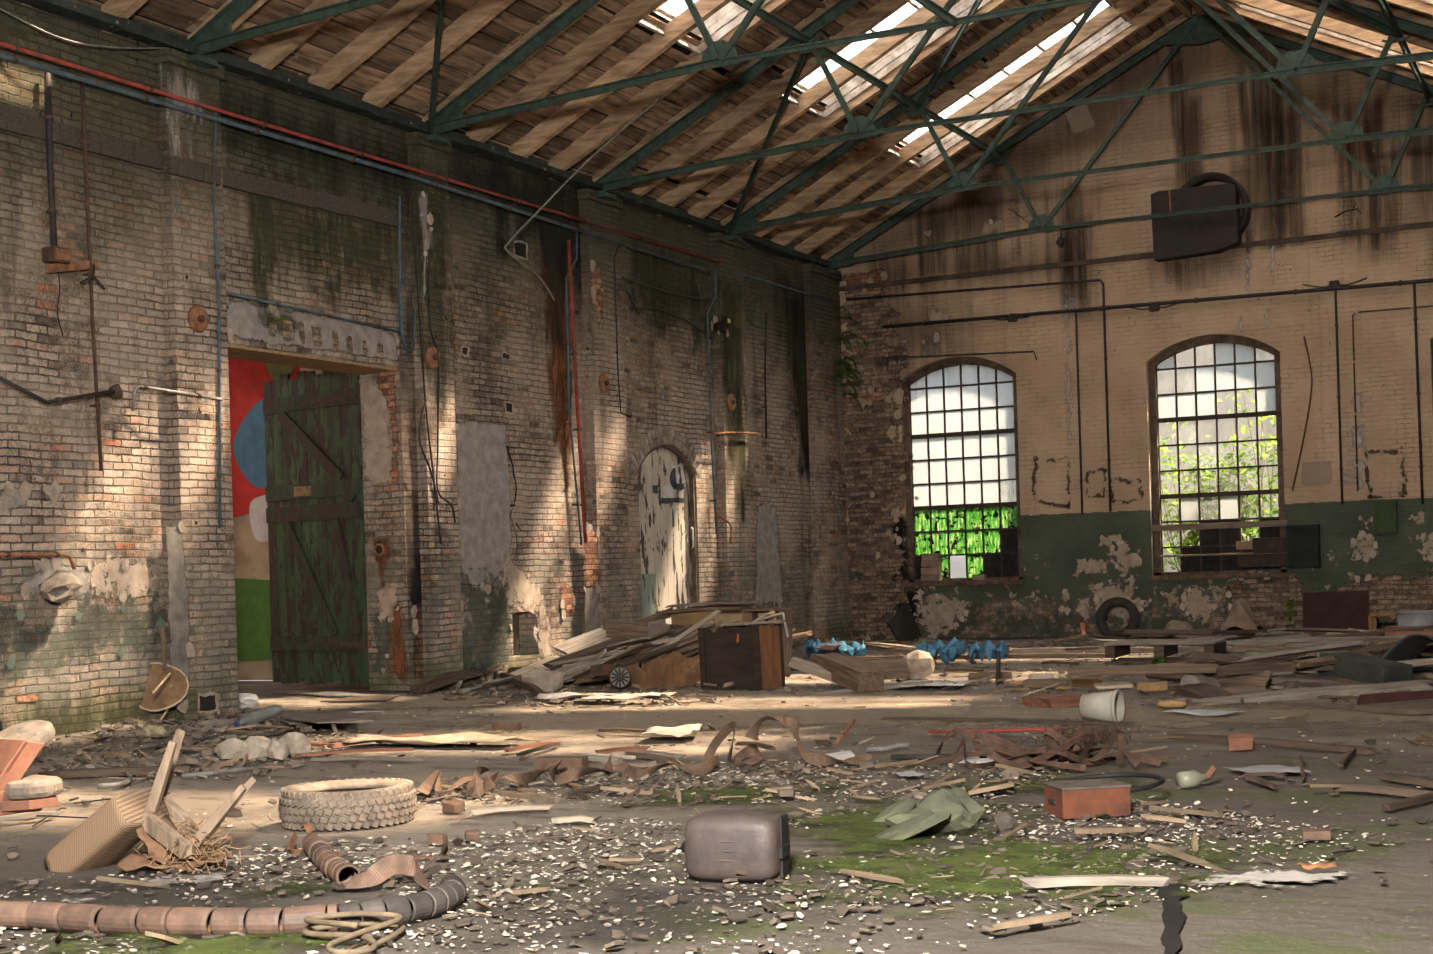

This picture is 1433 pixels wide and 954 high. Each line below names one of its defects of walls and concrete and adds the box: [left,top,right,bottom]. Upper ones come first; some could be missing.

corrosion [543,265,572,487]
peeling [0,557,167,682]
peeling [1058,533,1303,630]
peeling [1335,511,1433,624]